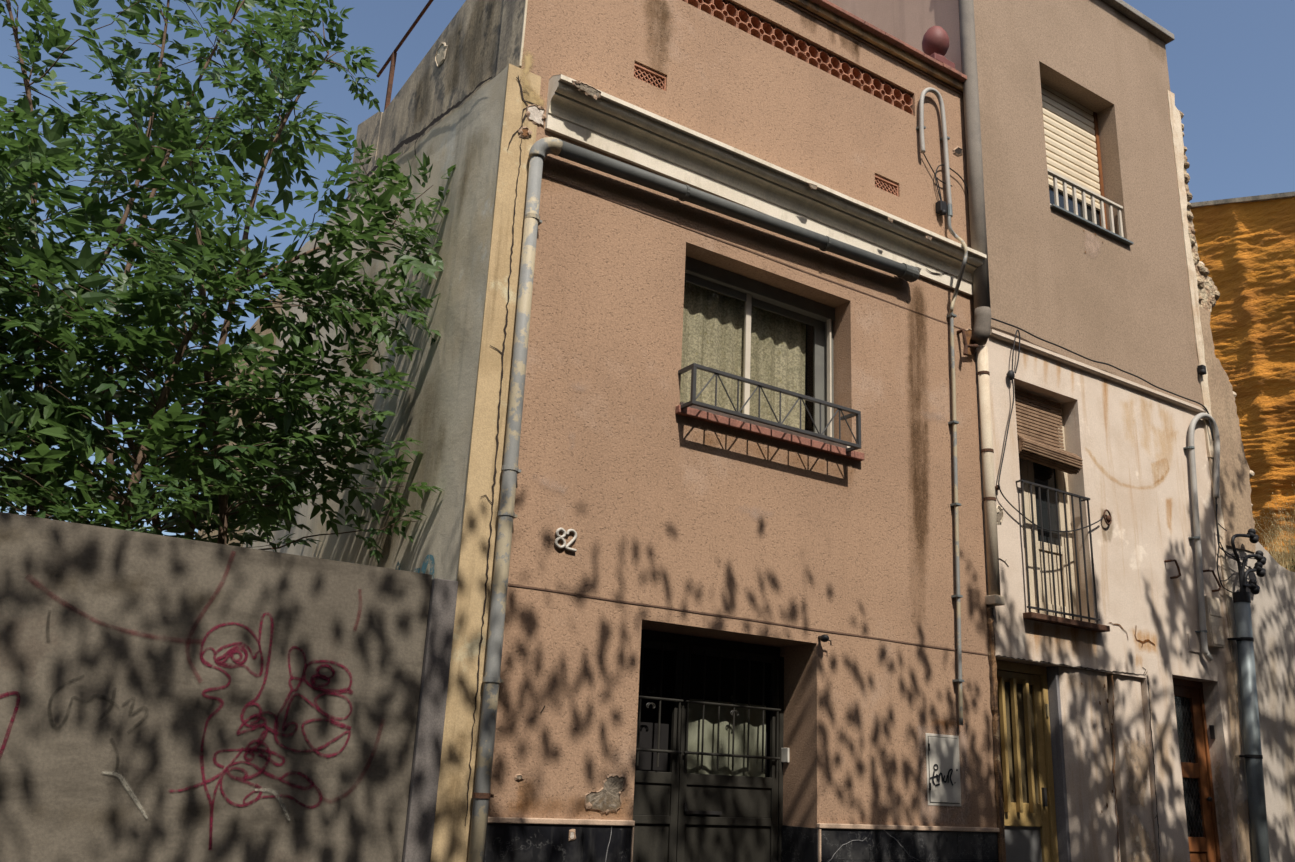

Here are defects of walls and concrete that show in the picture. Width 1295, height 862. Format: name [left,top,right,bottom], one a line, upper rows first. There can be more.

crack [346,75,544,826]
spalling [584,774,626,814]